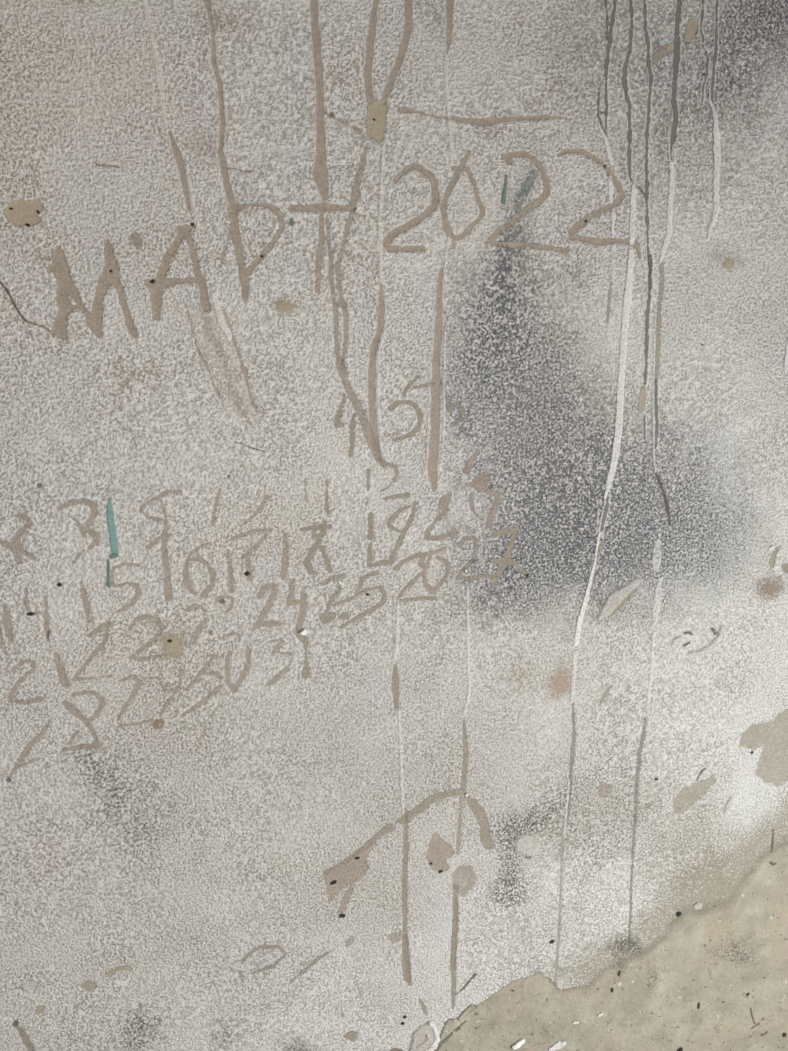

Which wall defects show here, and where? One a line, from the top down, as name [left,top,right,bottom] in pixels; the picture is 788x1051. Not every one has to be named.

peeling [4,199,43,227]
crack [0,281,51,331]
leakage [426,0,739,987]
flaking render [740,709,788,786]
flaking render [674,774,715,813]
peeling [324,842,376,918]
peeling [426,832,475,896]
peeling [238,945,287,983]
leakage [450,885,458,1009]
flaking render [436,804,788,1051]
peeling [12,1021,35,1051]